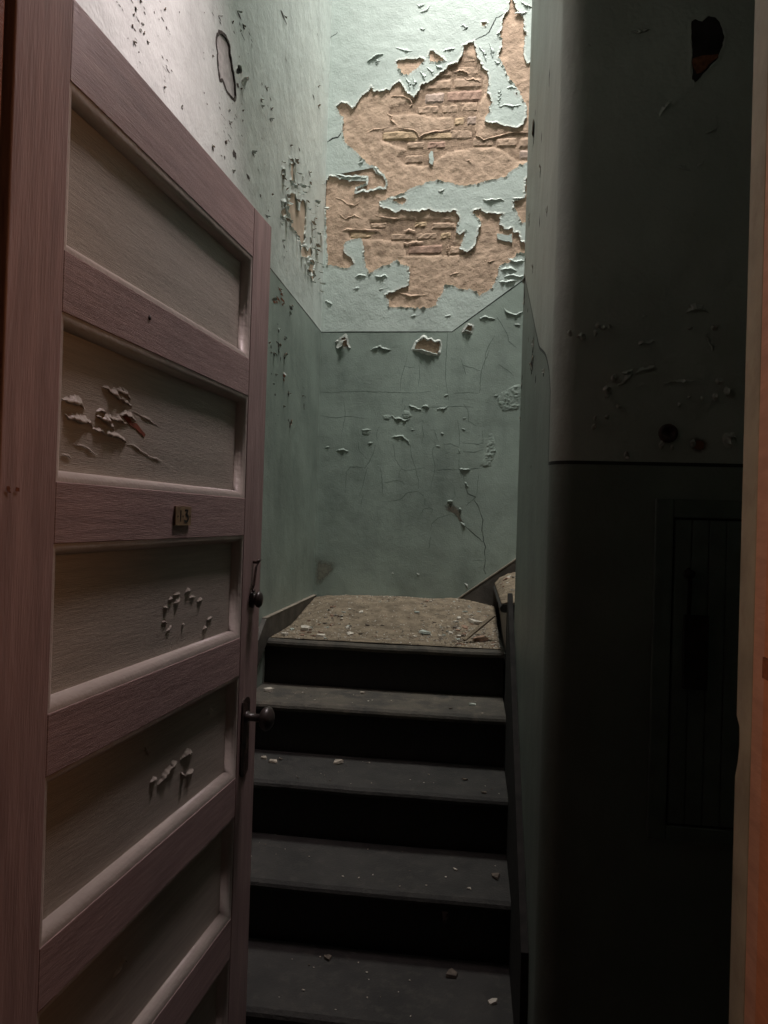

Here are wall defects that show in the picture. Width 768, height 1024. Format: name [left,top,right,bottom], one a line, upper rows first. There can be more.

peeling [117,0,171,53]
peeling [204,10,253,91]
hole [687,13,729,86]
peeling [204,93,262,181]
peeling [260,0,547,325]
peeling [335,334,351,349]
peeling [411,335,442,356]
peeling [494,337,544,419]
peeling [391,394,448,444]
crack [324,319,517,574]